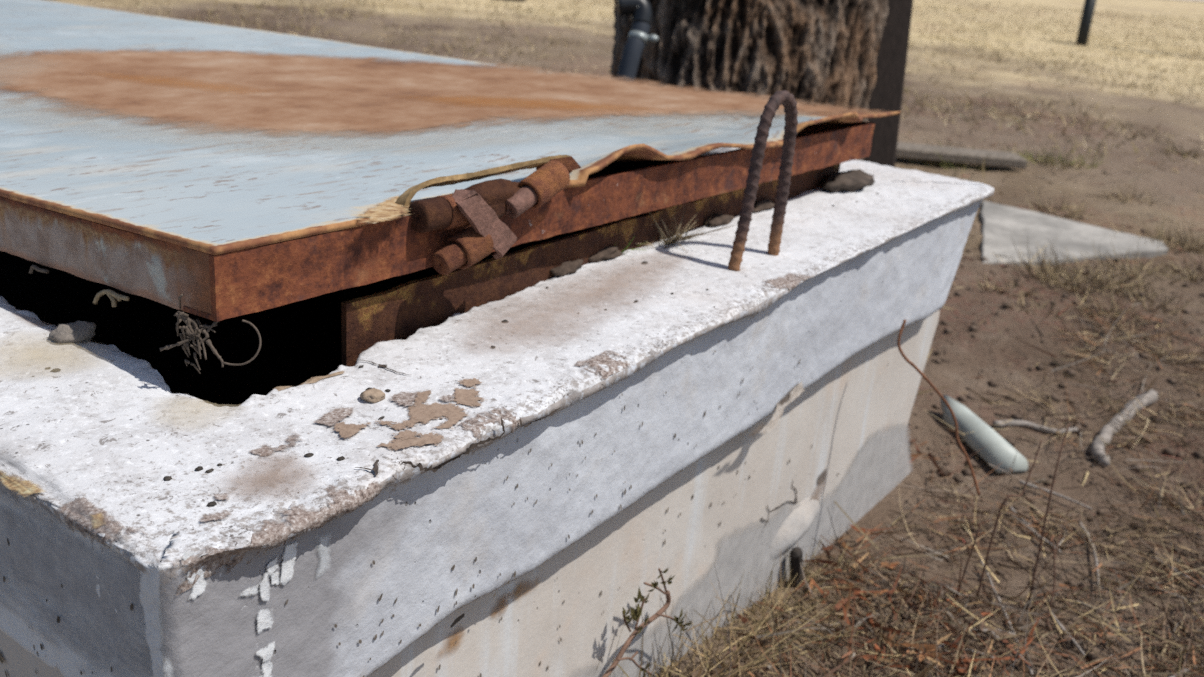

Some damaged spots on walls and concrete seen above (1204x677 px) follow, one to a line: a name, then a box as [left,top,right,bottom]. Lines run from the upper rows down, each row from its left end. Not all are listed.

corrosion [0,49,880,138]
corrosion [358,196,412,223]
spalling [265,371,344,396]
peeling [314,378,523,450]
spalling [0,471,44,496]
spalling [55,497,146,549]
spalling [95,481,382,677]